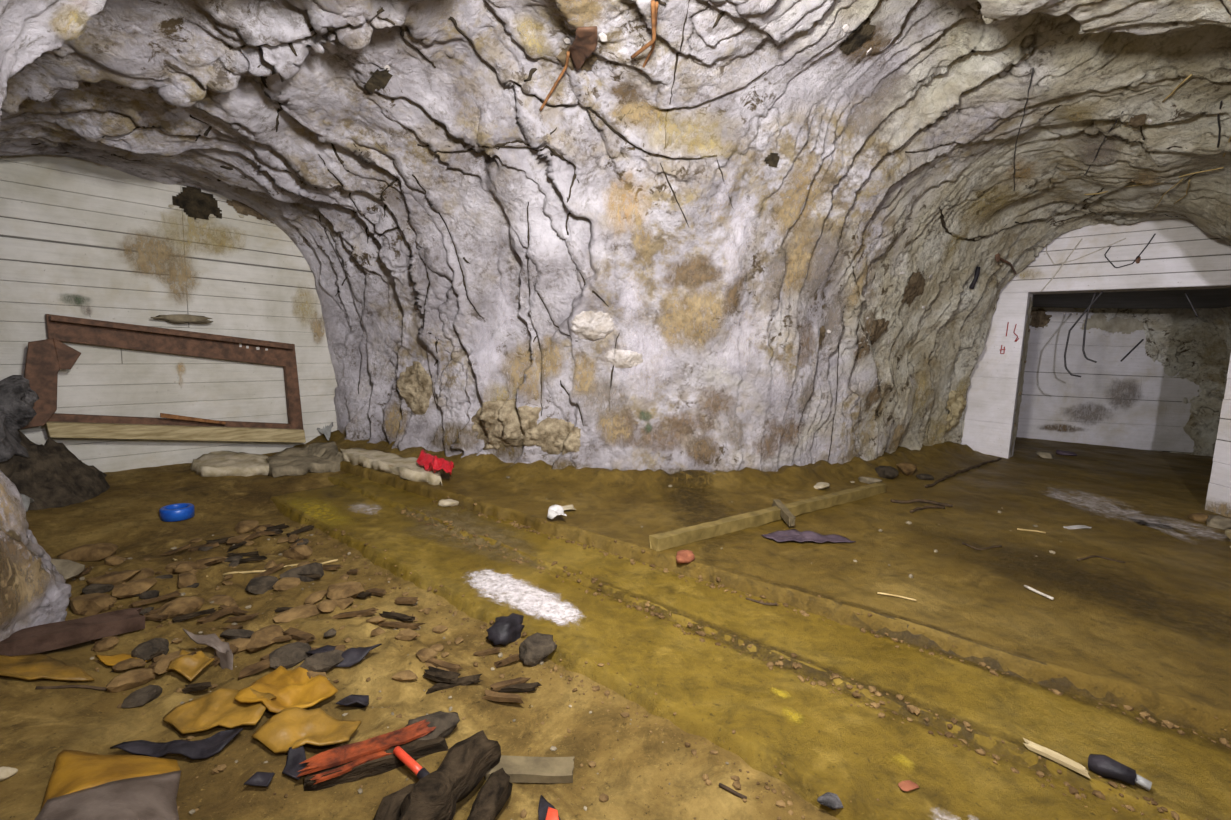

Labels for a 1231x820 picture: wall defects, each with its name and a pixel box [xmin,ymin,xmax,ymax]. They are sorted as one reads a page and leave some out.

crack [228,7,436,132]
crack [31,126,170,170]
crack [190,114,212,141]
crack [285,0,786,321]
crack [1140,126,1202,183]
spalling [169,186,273,223]
crack [939,188,1107,241]
leakage [124,217,232,299]
crack [423,264,439,408]
crack [525,202,620,426]
crack [828,266,864,460]
leakage [1043,383,1139,432]